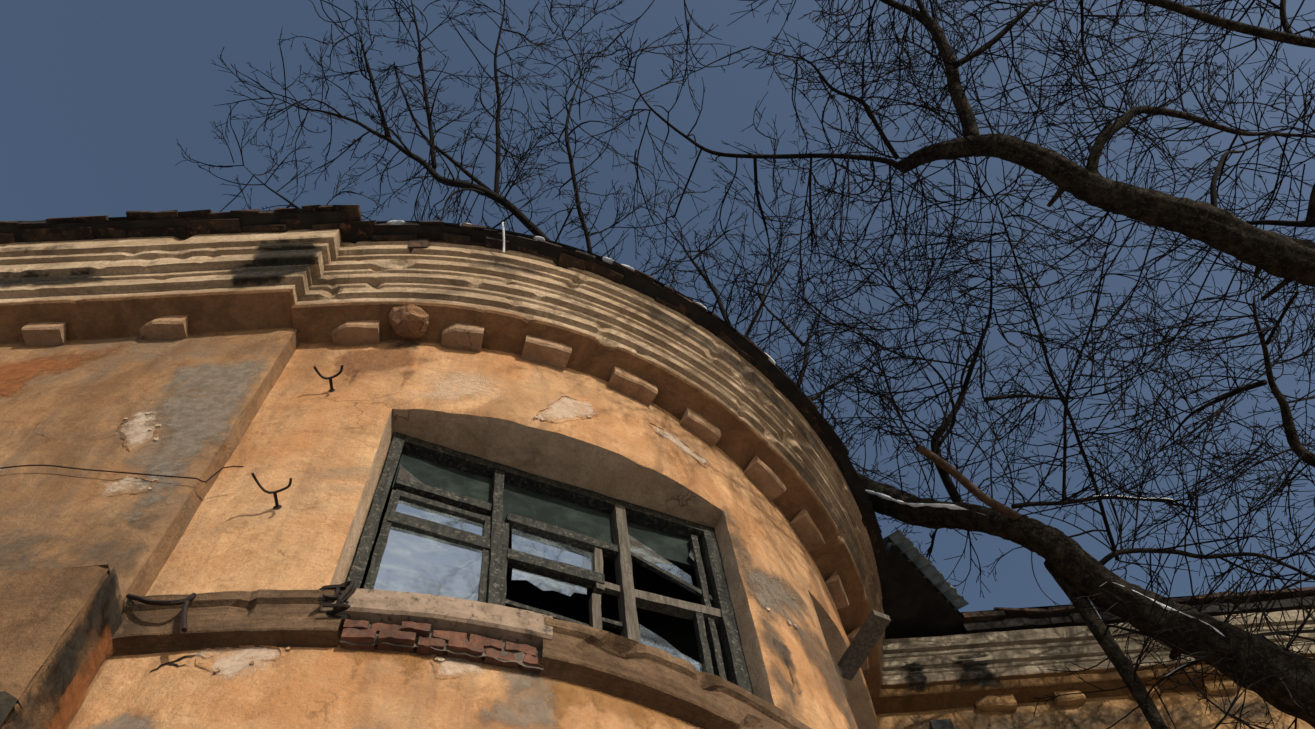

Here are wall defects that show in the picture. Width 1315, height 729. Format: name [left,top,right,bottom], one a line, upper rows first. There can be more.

peeling [533,395,600,424]
peeling [116,412,162,452]
peeling [647,422,710,469]
peeling [194,645,290,676]
flaking render [339,619,544,680]